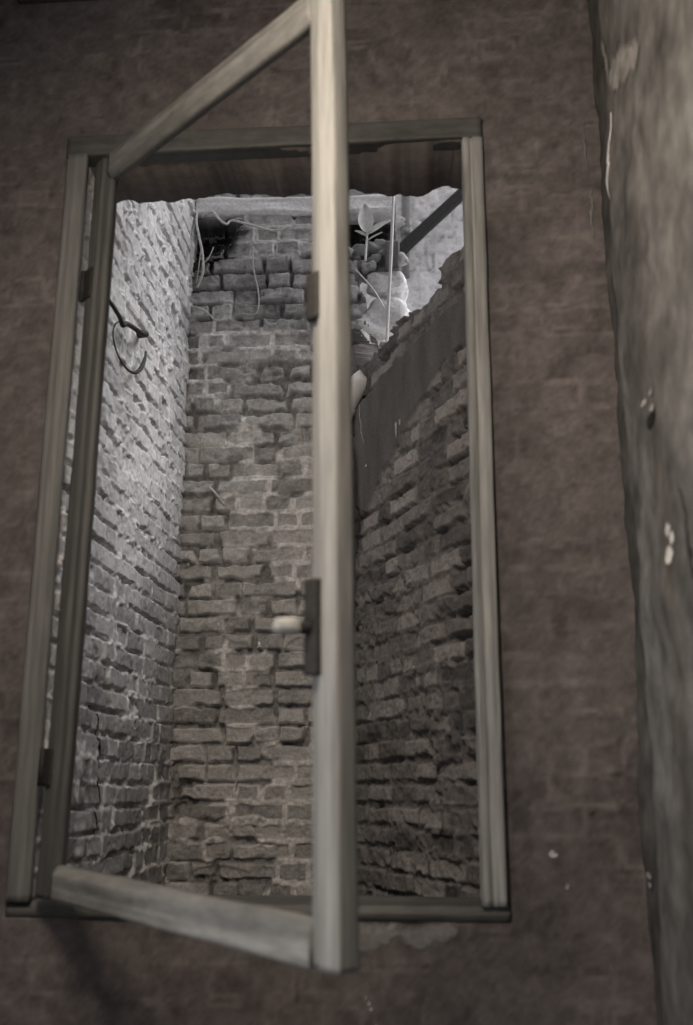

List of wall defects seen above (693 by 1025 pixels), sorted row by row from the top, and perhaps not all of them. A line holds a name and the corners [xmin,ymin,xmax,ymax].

flaking render [601,39,639,93]